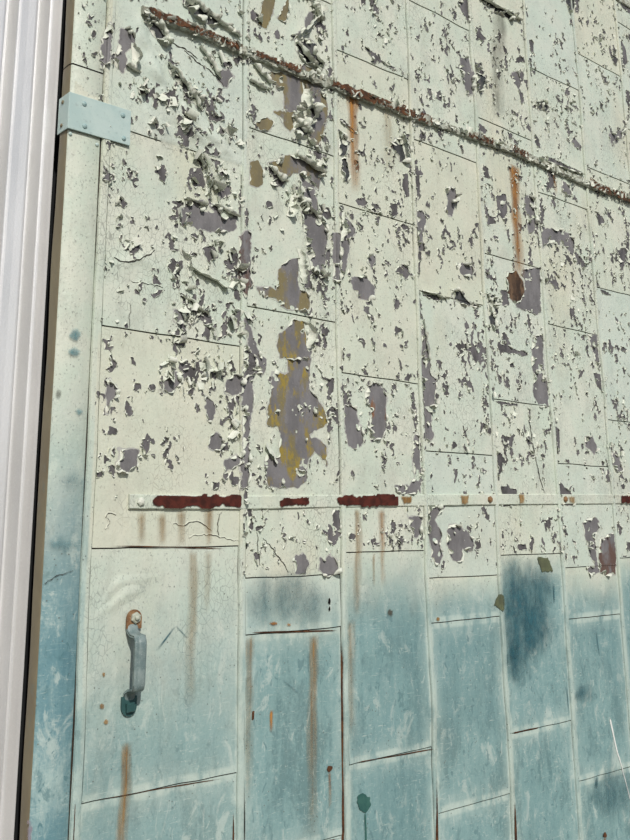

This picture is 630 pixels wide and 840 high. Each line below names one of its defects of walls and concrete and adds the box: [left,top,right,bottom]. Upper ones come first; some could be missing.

rust [149,7,243,50]
rust [256,50,303,73]
rust [332,80,432,164]
rust [590,177,630,202]
rust [511,166,520,262]
peeling [78,0,630,578]
rust [153,494,242,525]
rust [280,497,309,507]
rust [337,494,412,525]
rust [327,647,344,840]